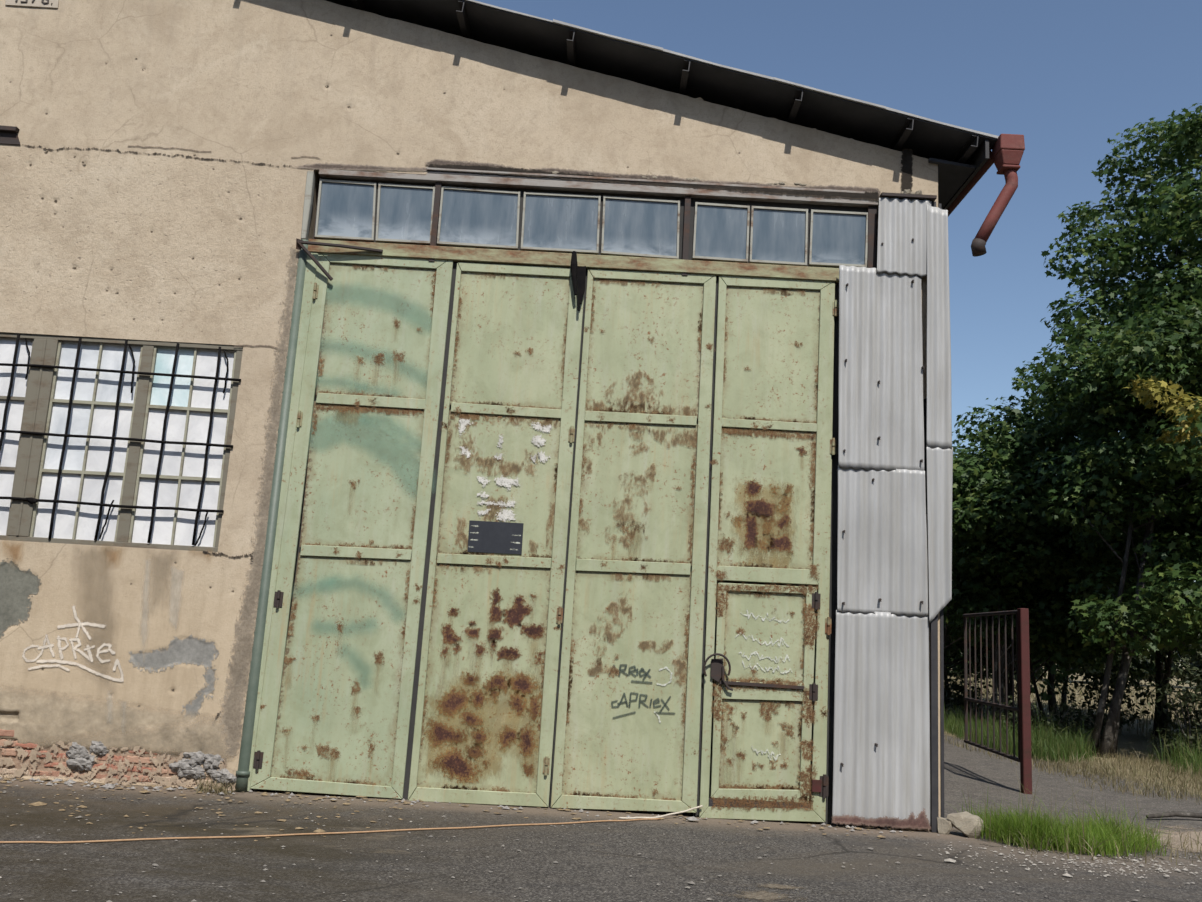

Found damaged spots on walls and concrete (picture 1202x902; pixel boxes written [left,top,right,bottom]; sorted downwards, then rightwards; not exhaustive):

crack [24,145,320,167]
corrosion [584,279,654,333]
corrosion [697,313,728,352]
corrosion [442,401,558,477]
flaking render [0,245,300,791]
corrosion [529,463,564,571]
corrosion [572,365,828,812]
corrosion [302,482,561,792]
corrosion [566,642,575,723]
corrosion [280,769,372,785]